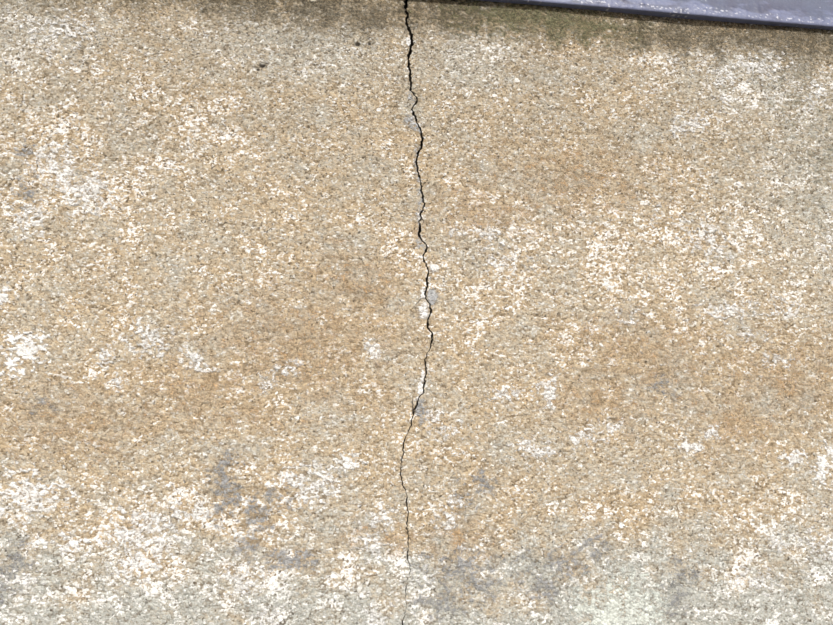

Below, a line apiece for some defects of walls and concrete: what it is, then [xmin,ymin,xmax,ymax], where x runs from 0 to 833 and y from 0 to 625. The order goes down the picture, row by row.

crack [400,0,439,625]